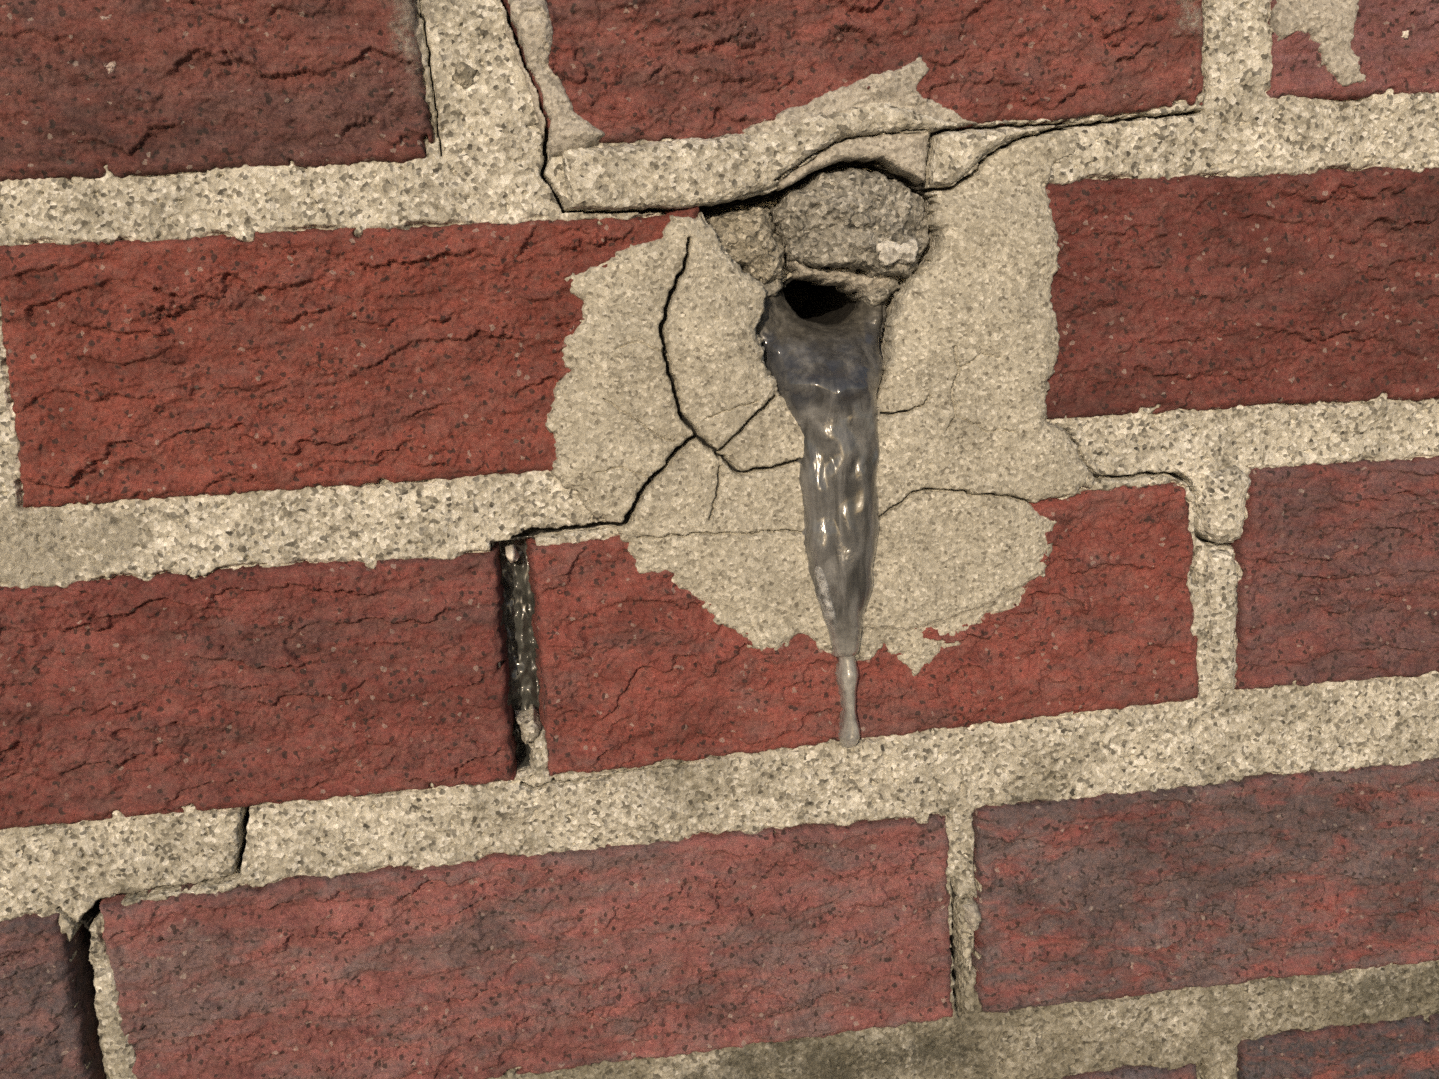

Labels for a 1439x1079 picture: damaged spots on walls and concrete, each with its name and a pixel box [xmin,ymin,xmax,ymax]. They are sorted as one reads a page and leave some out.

crack [501,0,527,70]
peeling [926,124,1068,186]
crack [511,109,1195,540]
peeling [628,395,804,538]
damp [815,568,835,618]
peeling [855,582,1028,676]
crack [237,806,250,868]
crack [79,898,102,943]
crack [949,892,957,997]